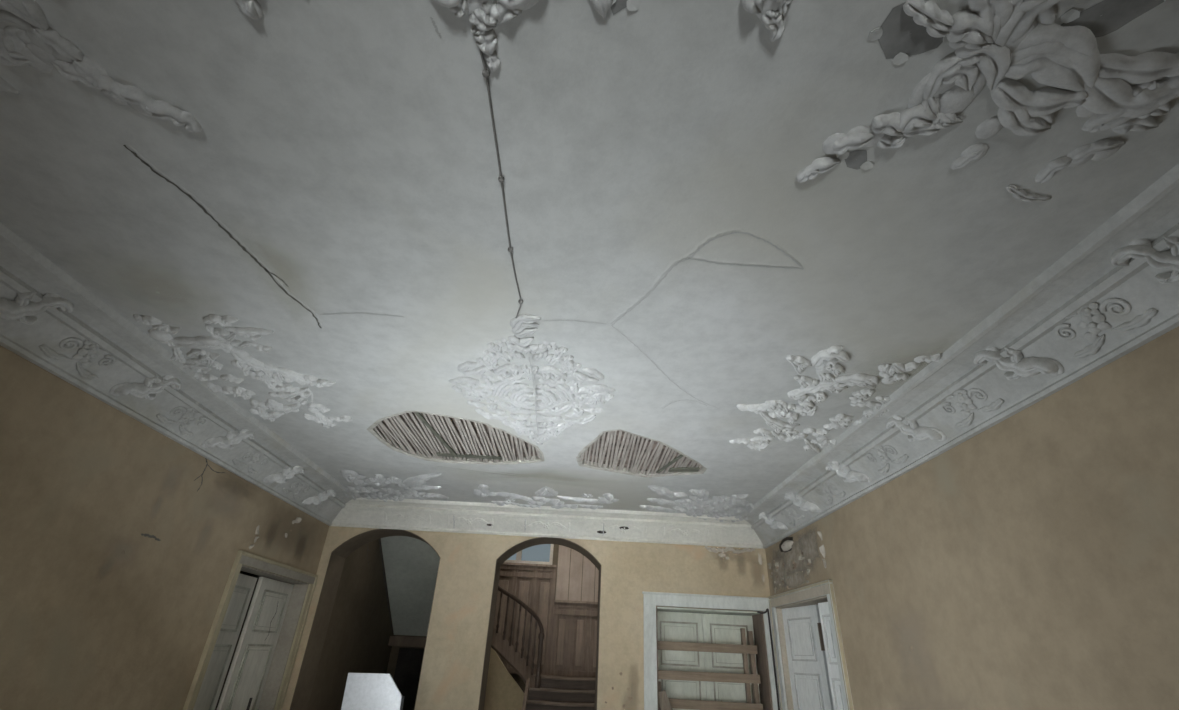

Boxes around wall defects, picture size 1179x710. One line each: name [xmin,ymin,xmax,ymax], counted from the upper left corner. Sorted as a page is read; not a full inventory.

crack [123,145,402,328]
flaking render [367,411,545,465]
flaking render [576,429,707,478]
peeling [705,531,826,594]